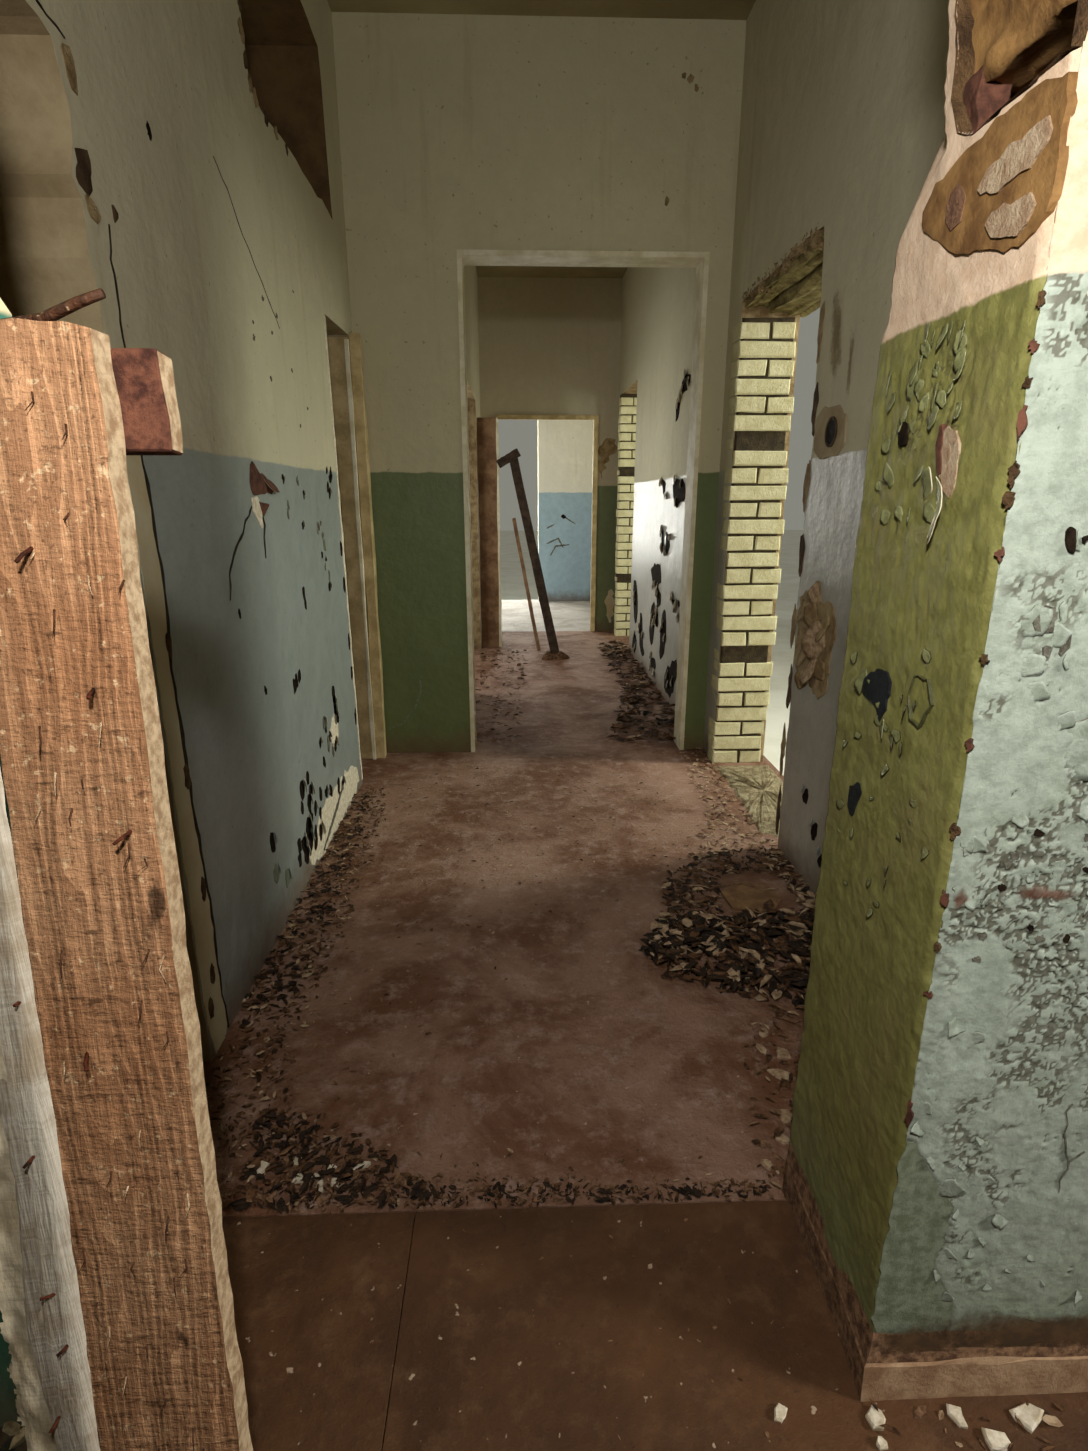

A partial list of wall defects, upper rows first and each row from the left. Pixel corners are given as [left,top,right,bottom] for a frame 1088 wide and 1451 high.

flaking render [922,0,1088,254]
flaking render [126,455,229,1054]
peeling [249,316,363,888]
peeling [604,525,681,713]
peeling [659,475,686,508]
flaking render [776,534,836,835]
peeling [875,319,967,544]
flaking render [1002,460,1021,509]
flaking render [1017,375,1033,440]
peeling [1064,527,1088,554]
peeling [871,1099,1010,1334]
crack [1058,1104,1085,1200]